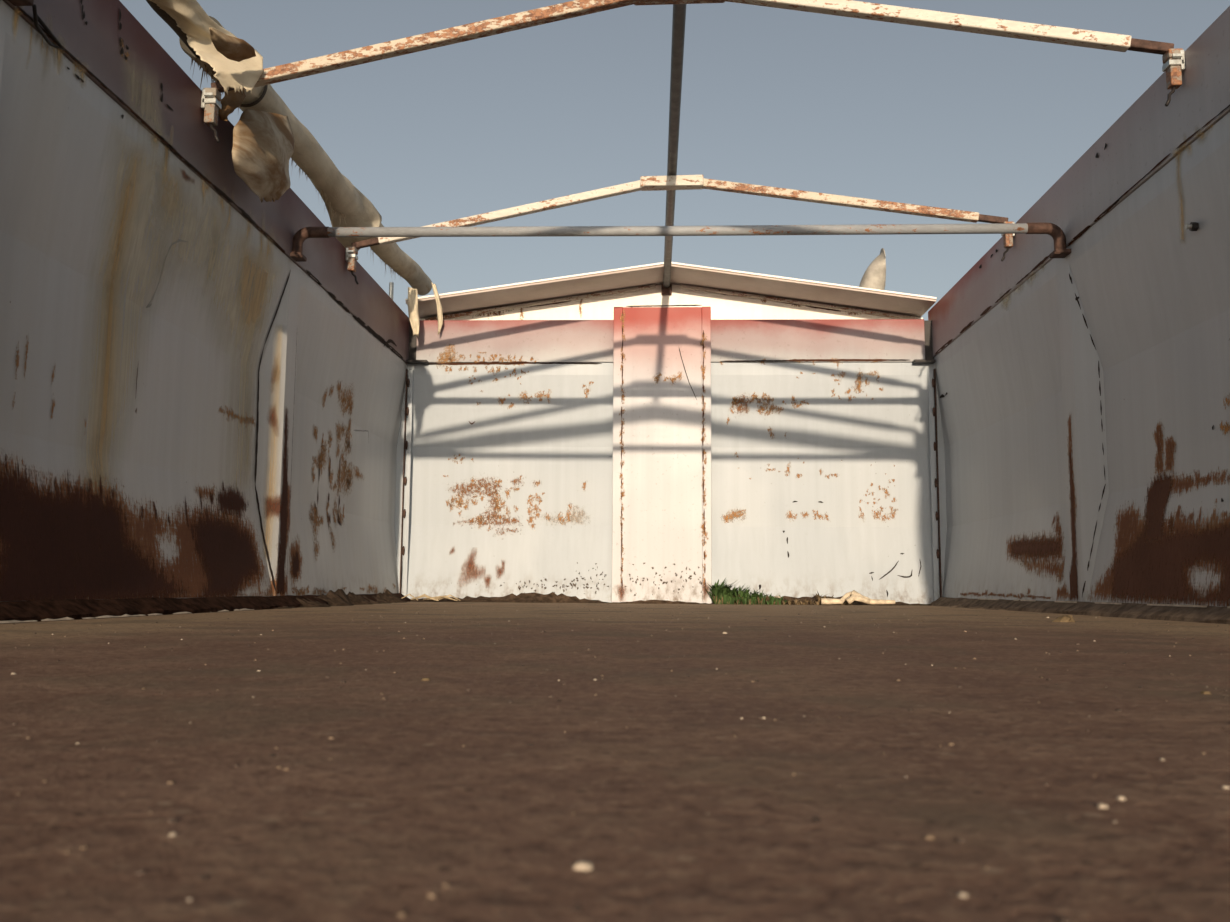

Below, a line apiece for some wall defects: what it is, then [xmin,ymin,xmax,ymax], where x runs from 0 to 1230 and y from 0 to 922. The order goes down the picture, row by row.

rust [831,358,883,401]
rust [727,392,809,438]
rust [0,382,363,601]
rust [443,454,572,535]
rust [859,465,898,523]
rust [960,416,1230,606]
rust [464,553,504,585]